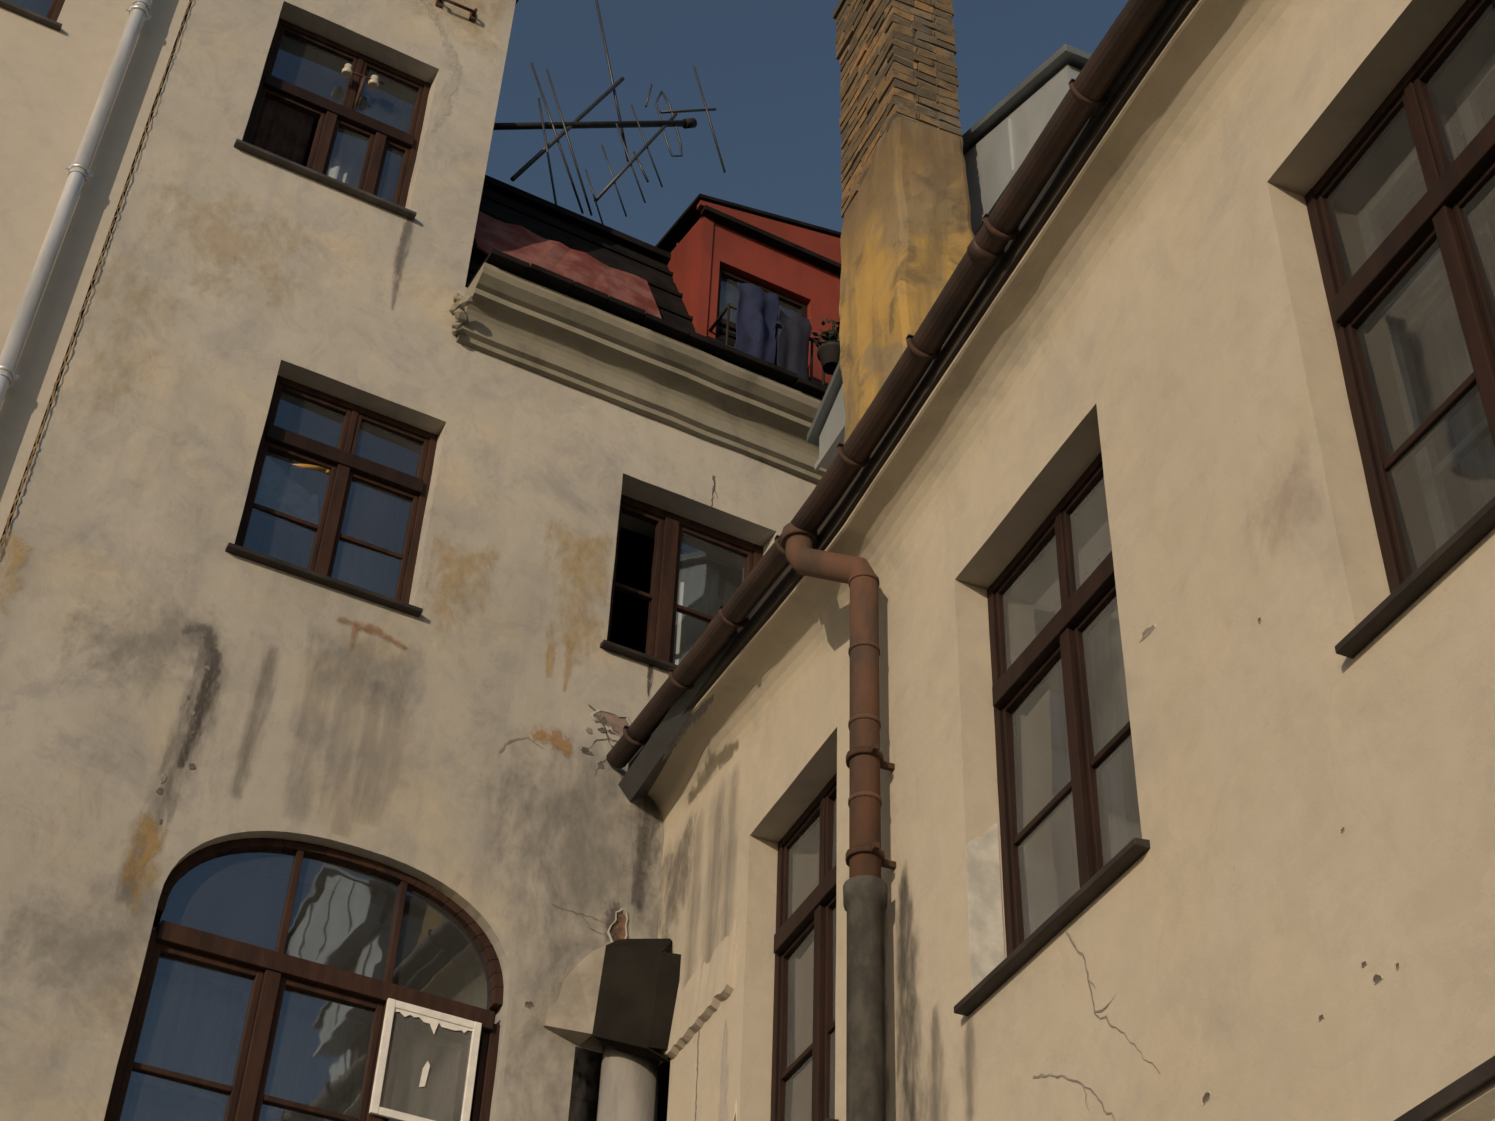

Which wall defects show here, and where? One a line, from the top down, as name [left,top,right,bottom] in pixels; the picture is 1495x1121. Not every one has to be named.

leakage [156,655,220,795]
spalling [499,709,632,769]
crack [1066,931,1160,1074]
crack [1033,1073,1115,1121]